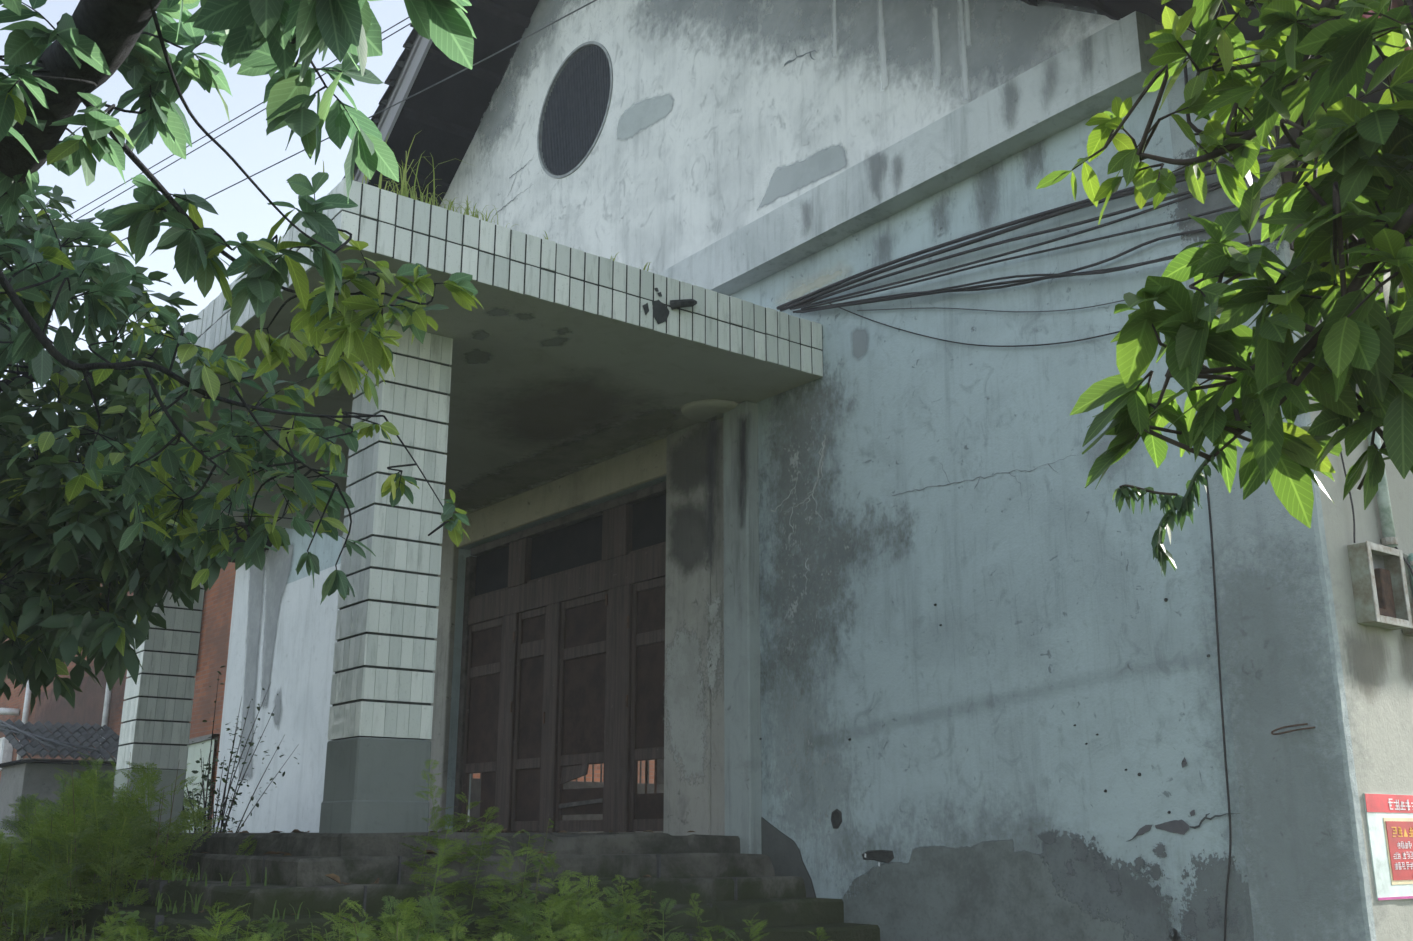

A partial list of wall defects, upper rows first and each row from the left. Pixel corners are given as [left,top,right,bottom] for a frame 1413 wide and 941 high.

water stain [879,0,887,88]
water stain [959,0,970,98]
spalling [643,288,697,324]
water stain [670,418,716,572]
water stain [738,418,747,526]
crack [892,448,1096,496]
water stain [764,378,907,833]
crack [1190,813,1240,829]
peeling [842,810,1254,941]